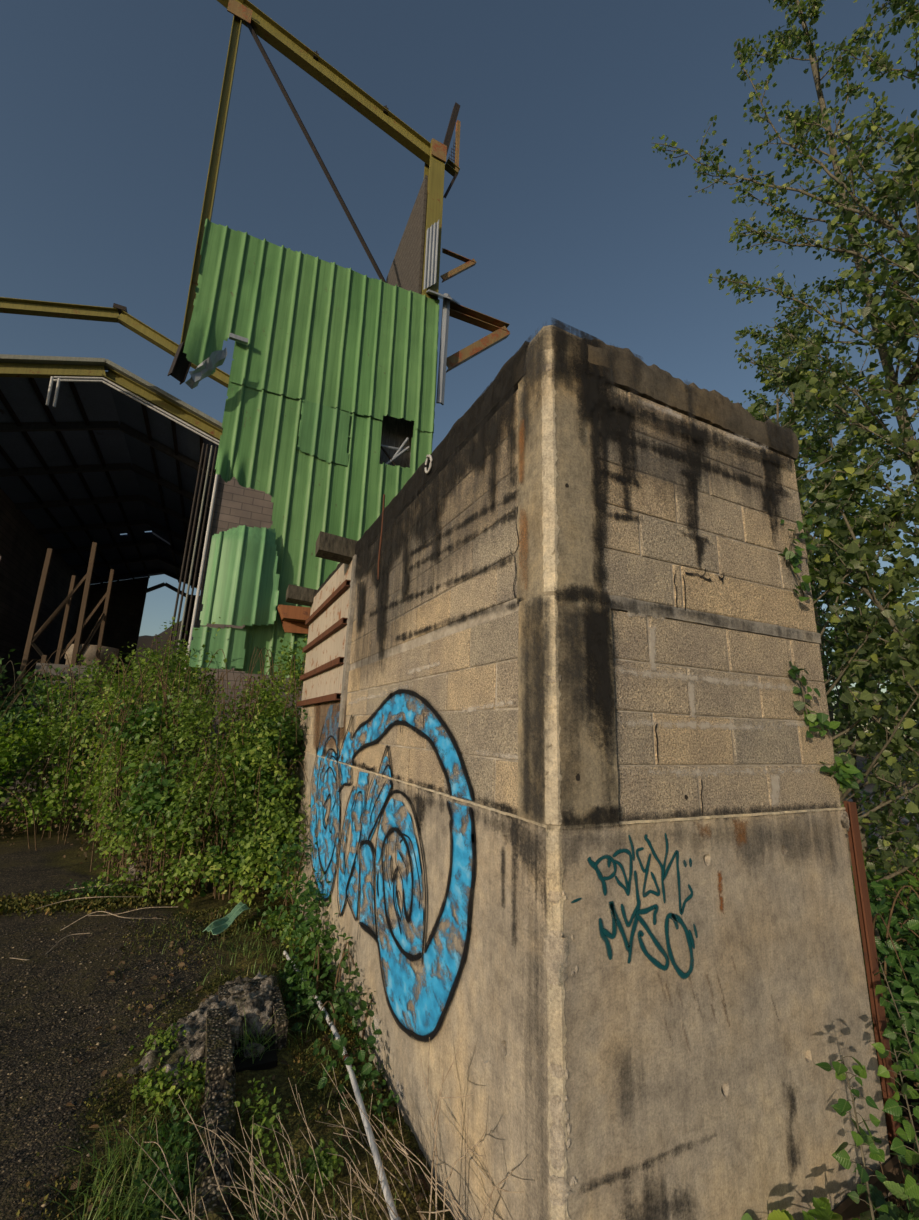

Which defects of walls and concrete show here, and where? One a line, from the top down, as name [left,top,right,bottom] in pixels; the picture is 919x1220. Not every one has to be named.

leakage [313,318,836,945]
leakage [625,1179,691,1220]